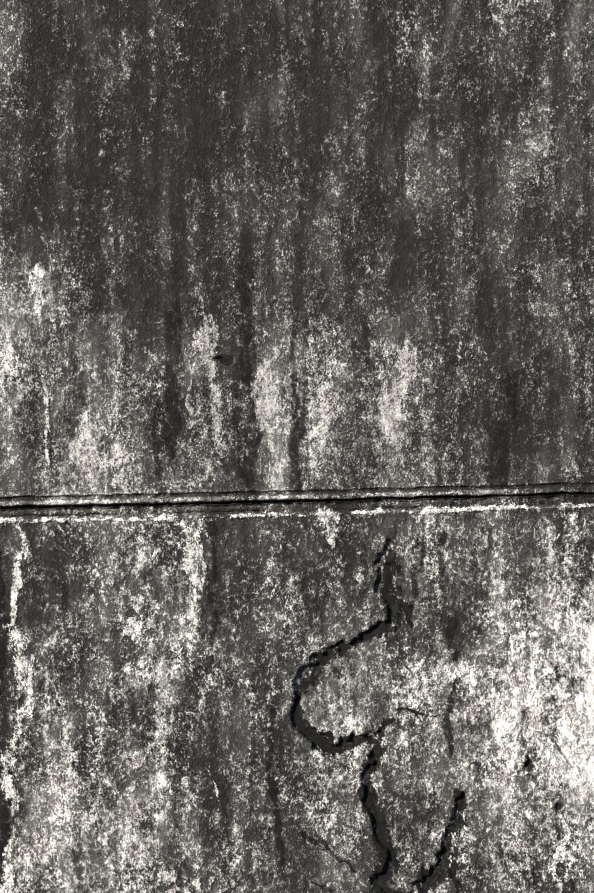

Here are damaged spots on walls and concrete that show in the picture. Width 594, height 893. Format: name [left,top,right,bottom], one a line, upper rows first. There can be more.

water stain [28,263,46,316]
water stain [2,333,19,377]
water stain [41,376,51,466]
water stain [231,265,262,496]
water stain [288,308,305,492]
water stain [481,370,519,489]
water stain [410,531,426,599]
water stain [437,527,446,588]
water stain [351,502,594,574]
crack [291,548,468,893]